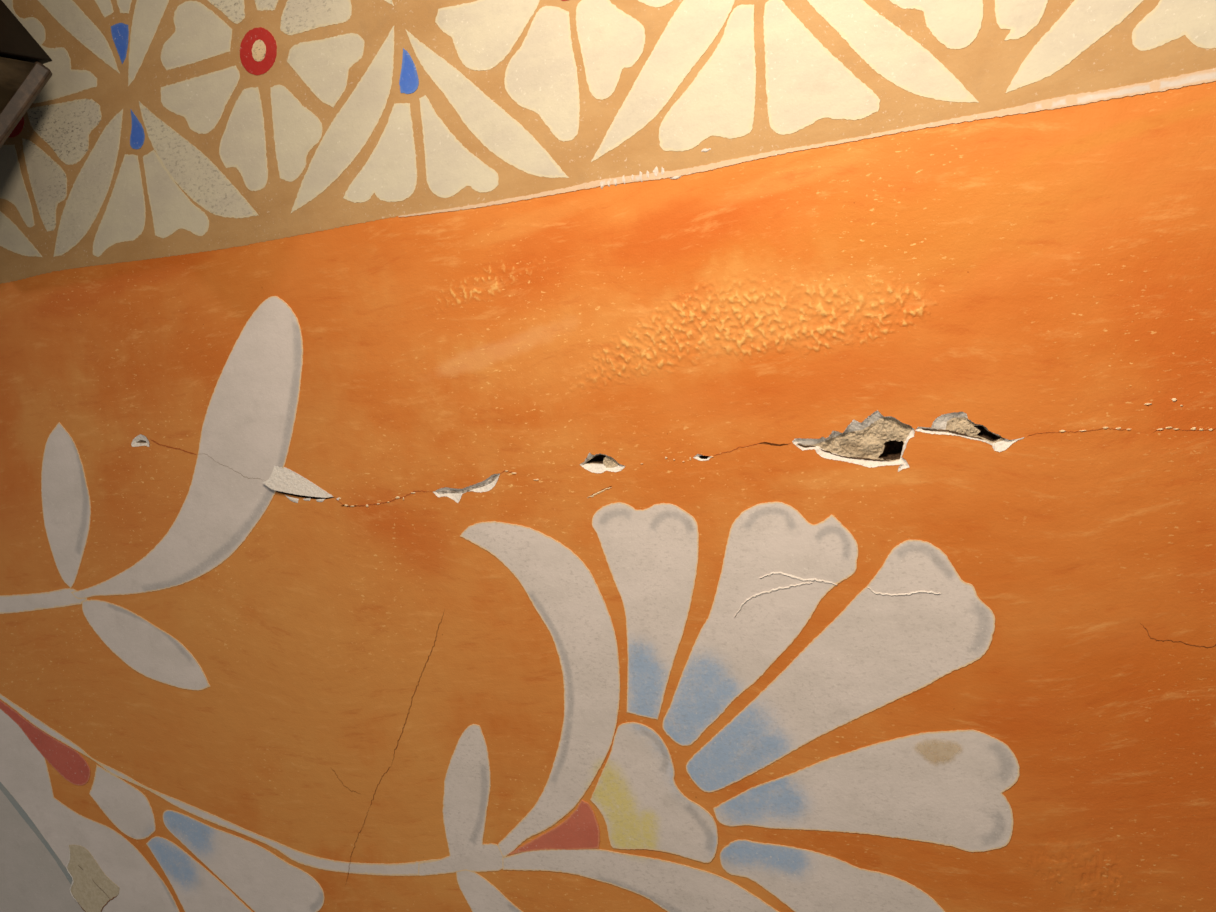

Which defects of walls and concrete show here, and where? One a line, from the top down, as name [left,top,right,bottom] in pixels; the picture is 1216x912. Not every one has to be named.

crack [1024,398,1216,438]
flaking render [131,434,149,447]
crack [151,440,262,480]
flaking render [580,453,625,473]
crack [641,442,790,464]
flaking render [792,410,1024,472]
flaking render [263,465,339,503]
crack [338,490,429,507]
flaking render [433,474,500,503]
crack [1141,624,1216,648]
crack [331,609,445,886]